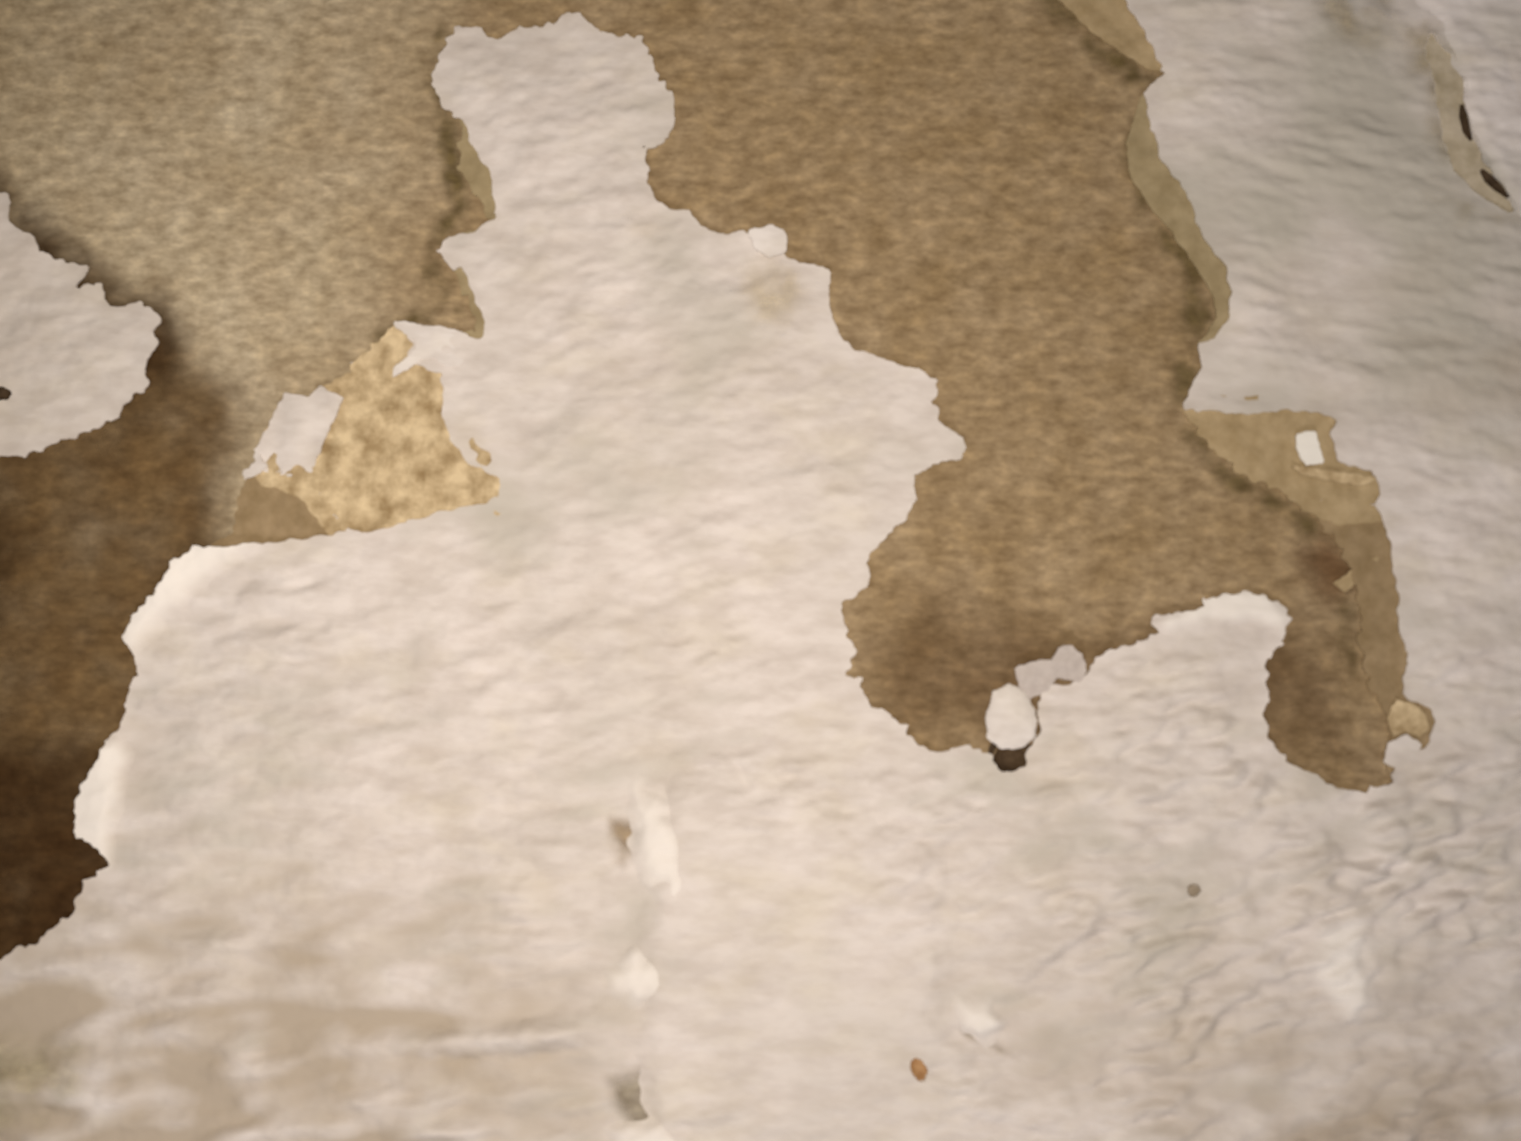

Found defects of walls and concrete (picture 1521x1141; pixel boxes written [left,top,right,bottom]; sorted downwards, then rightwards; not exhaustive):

peeling [1415,0,1521,216]
peeling [0,0,1435,793]
peeling [74,732,136,874]
spalling [1187,884,1201,897]